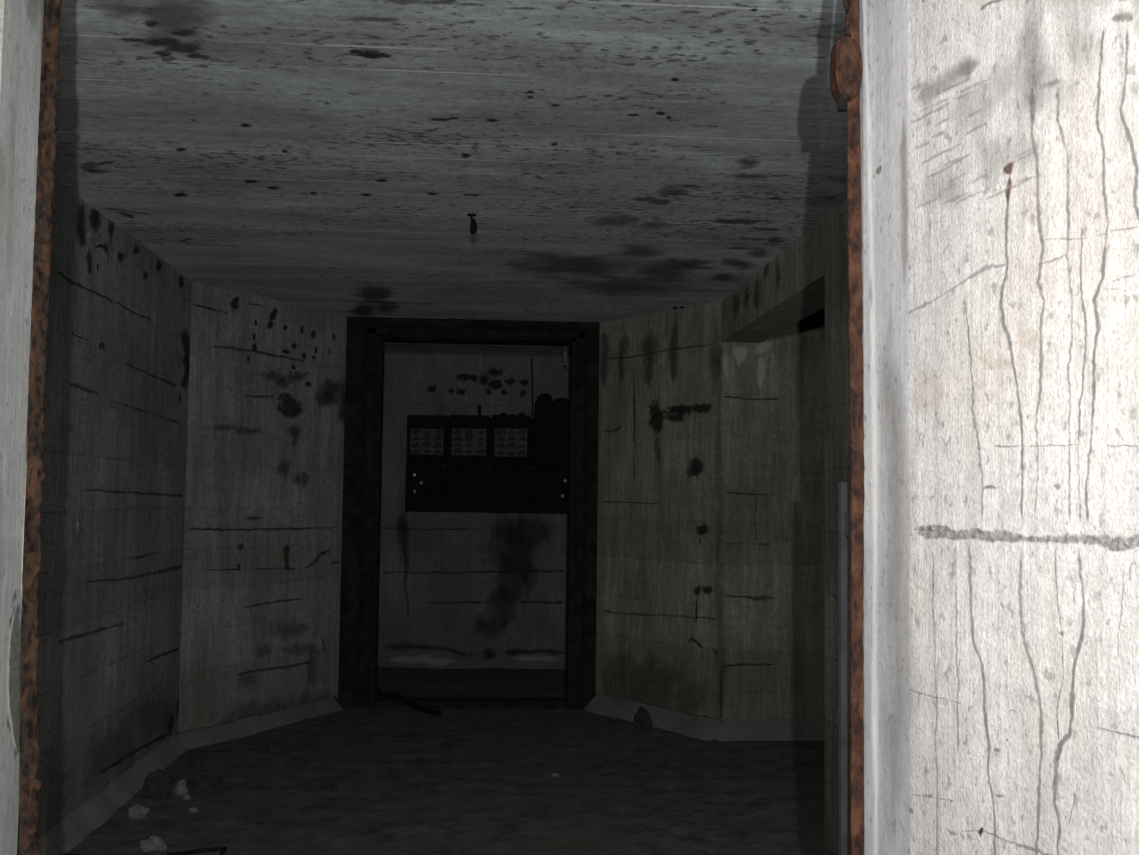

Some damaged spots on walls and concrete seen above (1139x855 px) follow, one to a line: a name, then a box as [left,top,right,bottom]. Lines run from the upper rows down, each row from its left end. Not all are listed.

crack [1096,31,1139,219]
crack [1000,89,1044,515]
crack [1078,231,1106,519]
crack [918,523,949,531]
crack [969,554,1085,855]